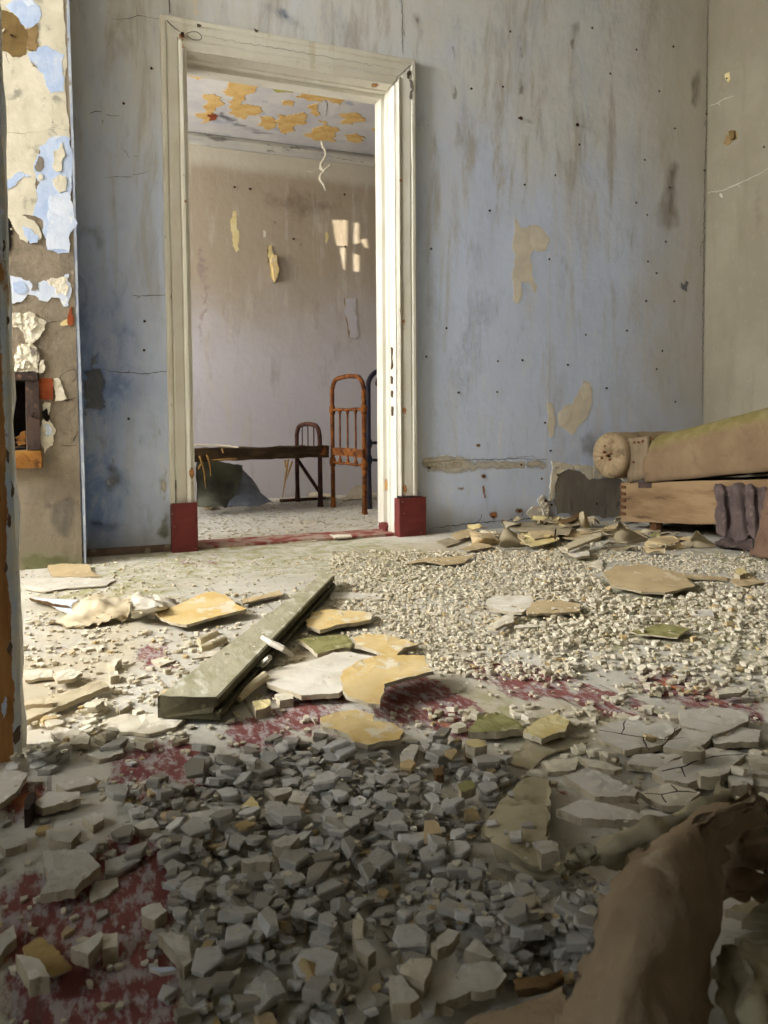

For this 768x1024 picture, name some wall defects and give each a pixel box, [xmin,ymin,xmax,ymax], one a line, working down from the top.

peeling [195,82,375,143]
peeling [230,211,239,252]
peeling [263,231,279,283]
peeling [512,214,550,304]
peeling [0,0,102,578]
peeling [547,381,592,438]
flaking render [549,461,628,518]
crack [600,721,683,750]
crack [645,754,741,802]